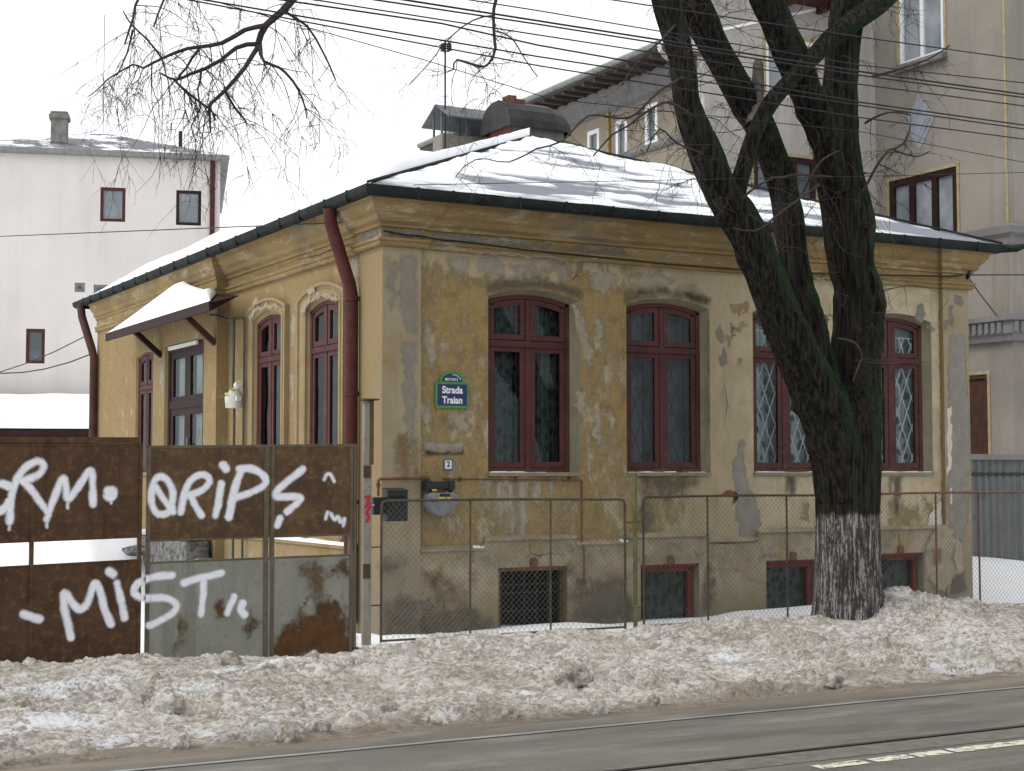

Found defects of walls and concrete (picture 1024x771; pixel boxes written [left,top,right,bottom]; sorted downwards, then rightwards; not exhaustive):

peeling [388,257,450,446]
peeling [572,303,604,362]
peeling [715,302,749,366]
peeling [889,295,971,542]
peeling [723,440,761,537]
rust [274,559,353,657]
damp [385,573,489,635]